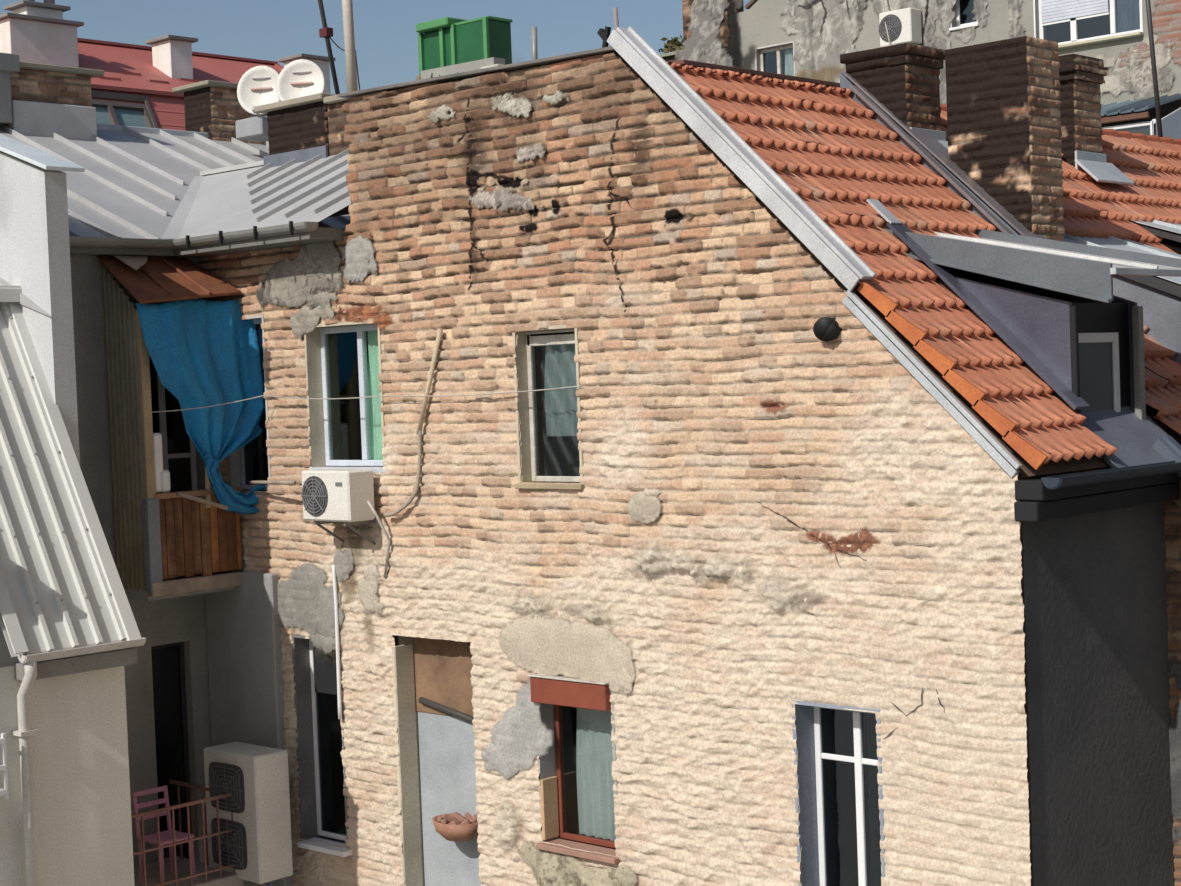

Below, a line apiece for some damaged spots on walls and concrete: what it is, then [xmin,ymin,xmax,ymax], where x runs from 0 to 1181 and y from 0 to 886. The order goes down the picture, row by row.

flaking render [1007,0,1026,39]
flaking render [779,0,988,104]
flaking render [1096,0,1181,100]
peeling [543,90,568,104]
peeling [427,104,455,123]
peeling [516,143,545,161]
spalling [466,170,528,193]